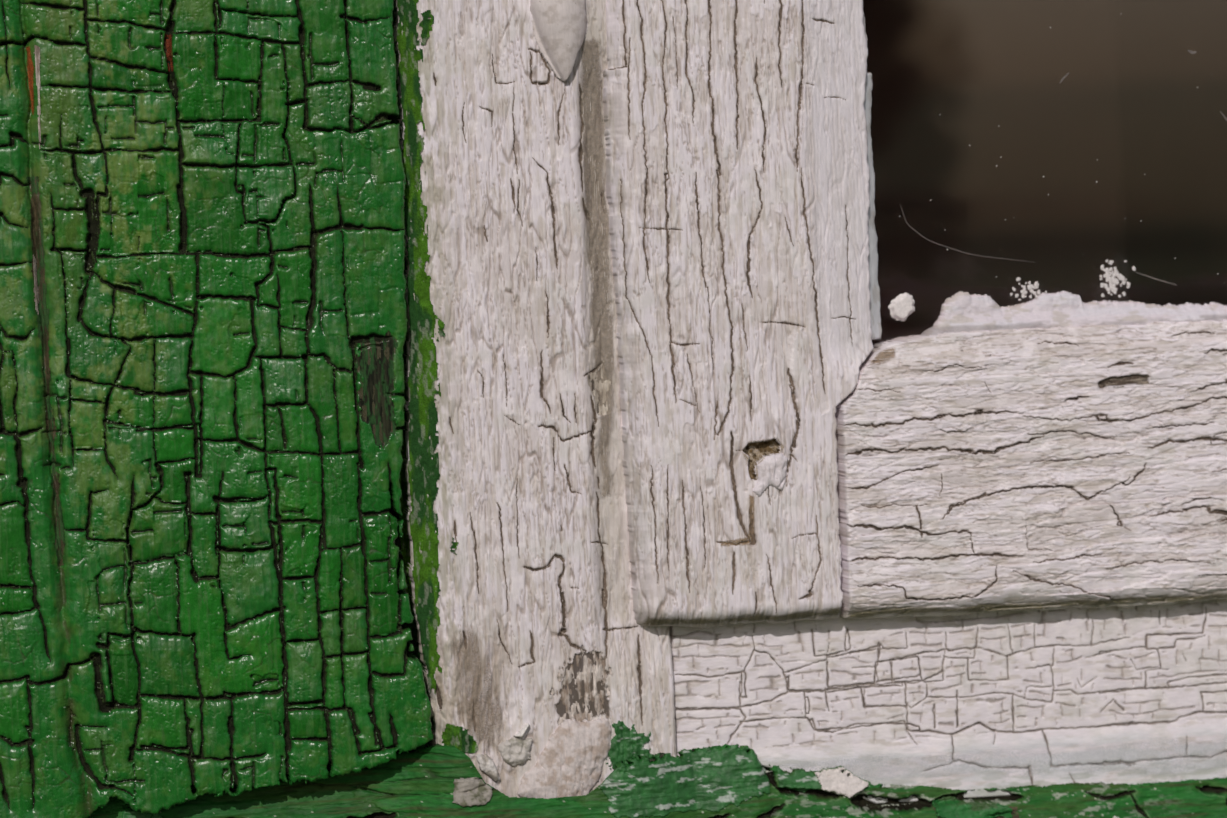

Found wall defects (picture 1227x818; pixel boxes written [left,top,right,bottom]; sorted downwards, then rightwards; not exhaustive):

crack [0,0,416,810]
peeling [354,332,398,449]
crack [454,0,1227,785]
crack [435,684,443,711]
peeling [550,646,613,726]
peeling [452,723,532,807]
peeling [815,766,869,798]
peeling [932,795,1019,818]